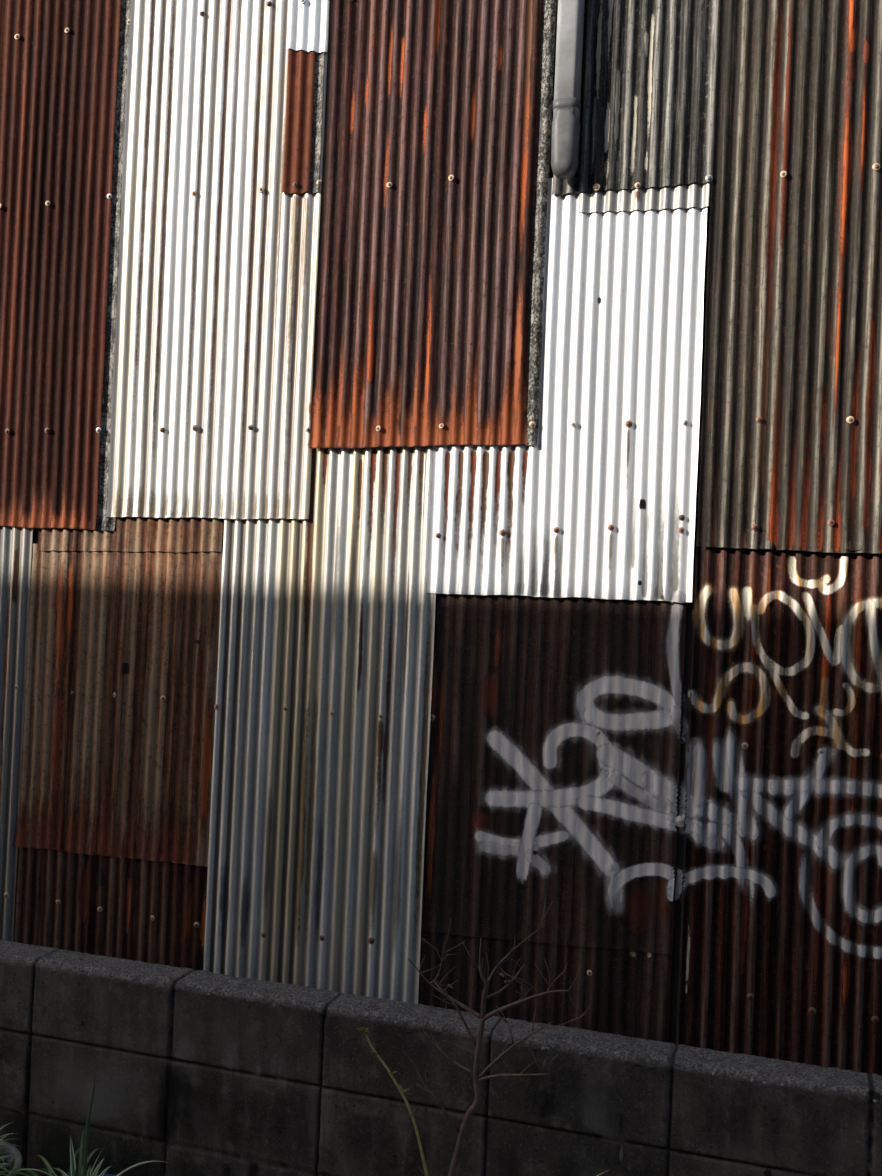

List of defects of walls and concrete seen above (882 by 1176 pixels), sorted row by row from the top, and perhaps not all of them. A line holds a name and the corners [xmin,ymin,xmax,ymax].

rust [520,0,533,238]
rust [0,488,90,529]
rust [739,0,882,1008]
rust [0,550,19,805]
rust [12,558,217,864]
rust [377,634,392,810]
rust [416,632,444,922]
rust [703,654,713,826]